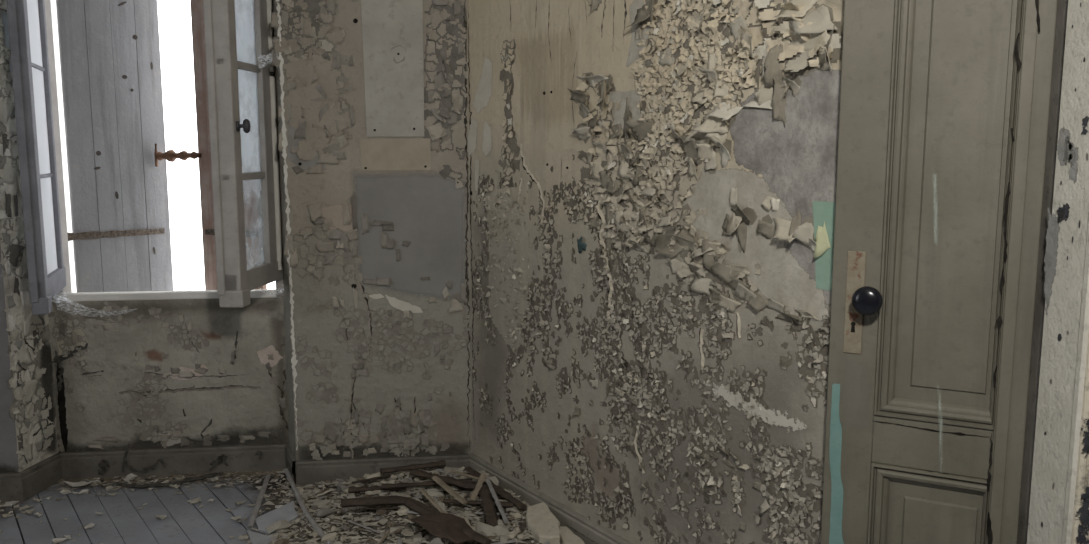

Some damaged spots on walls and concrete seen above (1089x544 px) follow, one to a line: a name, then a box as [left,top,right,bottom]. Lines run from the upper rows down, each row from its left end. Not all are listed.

peeling [0,0,271,472]
peeling [1044,203,1080,315]
peeling [1081,419,1089,458]
peeling [1075,487,1089,544]